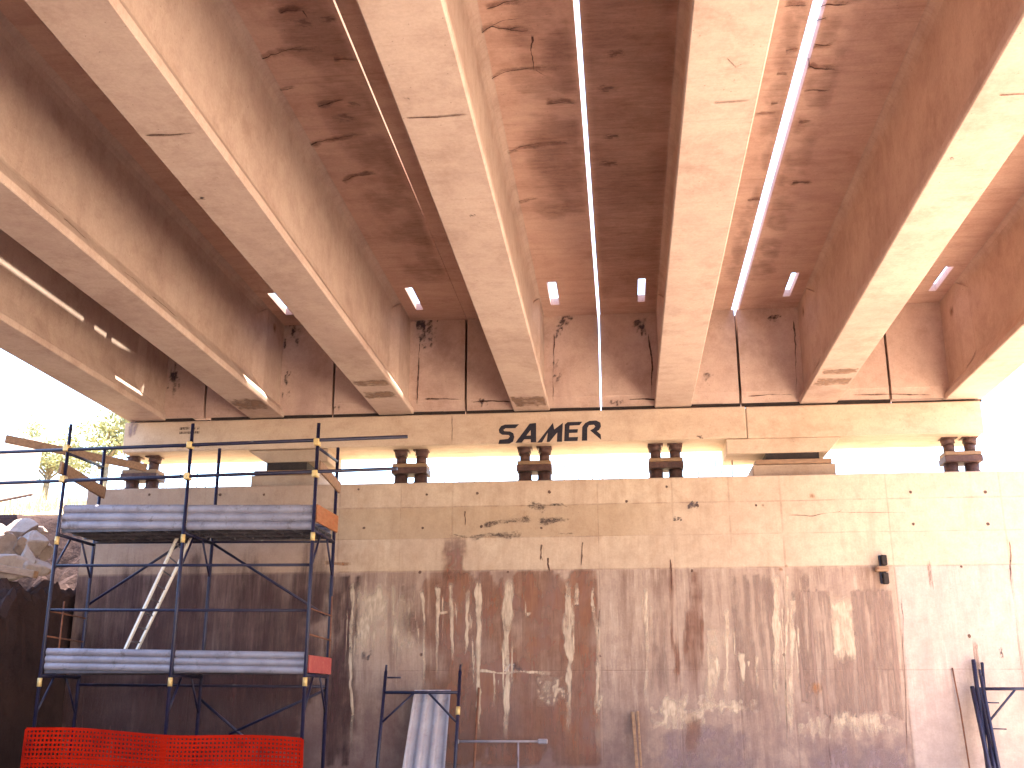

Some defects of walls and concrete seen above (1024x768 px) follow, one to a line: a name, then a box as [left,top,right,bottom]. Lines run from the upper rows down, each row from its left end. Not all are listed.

crack [482,1,540,79]
crack [417,344,509,402]
crack [630,335,655,400]
water stain [62,541,602,766]
corrosion [671,616,703,675]
water stain [659,575,907,768]